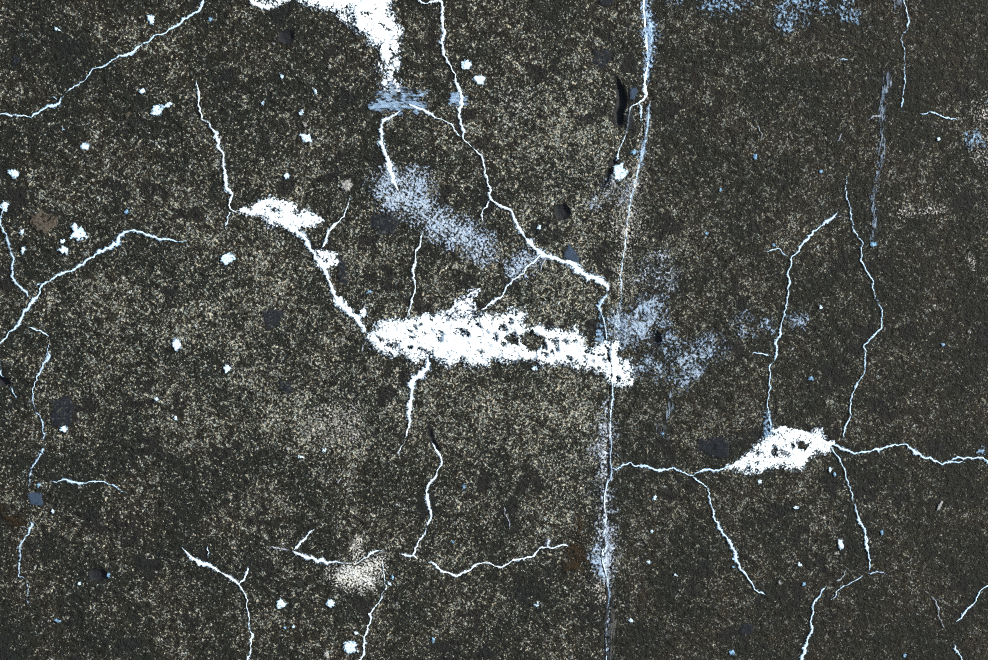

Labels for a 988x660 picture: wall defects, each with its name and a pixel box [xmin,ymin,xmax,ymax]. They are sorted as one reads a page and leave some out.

crack [0,0,204,118]
water stain [249,0,429,116]
crack [0,205,188,603]
water stain [236,194,325,233]
crack [280,196,368,354]
water stain [314,249,339,271]
water stain [333,250,726,438]
crack [377,0,765,660]
water stain [730,310,775,338]
water stain [724,411,835,475]
crack [753,176,988,660]
crack [269,443,568,660]